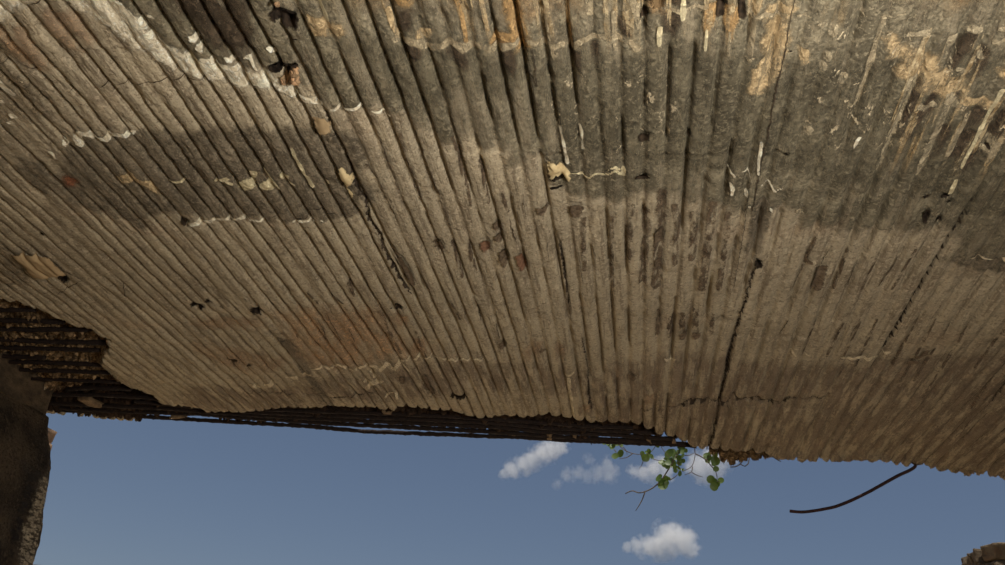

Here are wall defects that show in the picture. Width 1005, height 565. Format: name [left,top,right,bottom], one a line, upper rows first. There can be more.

water stain [0,0,29,22]
spalling [281,67,301,87]
corrosion [703,0,809,95]
spalling [313,117,332,135]
water stain [16,0,1005,291]
peeling [11,251,65,279]
crack [298,110,419,306]
crack [638,0,825,444]
crack [833,198,999,352]
spalling [0,299,769,466]
crack [582,338,593,410]